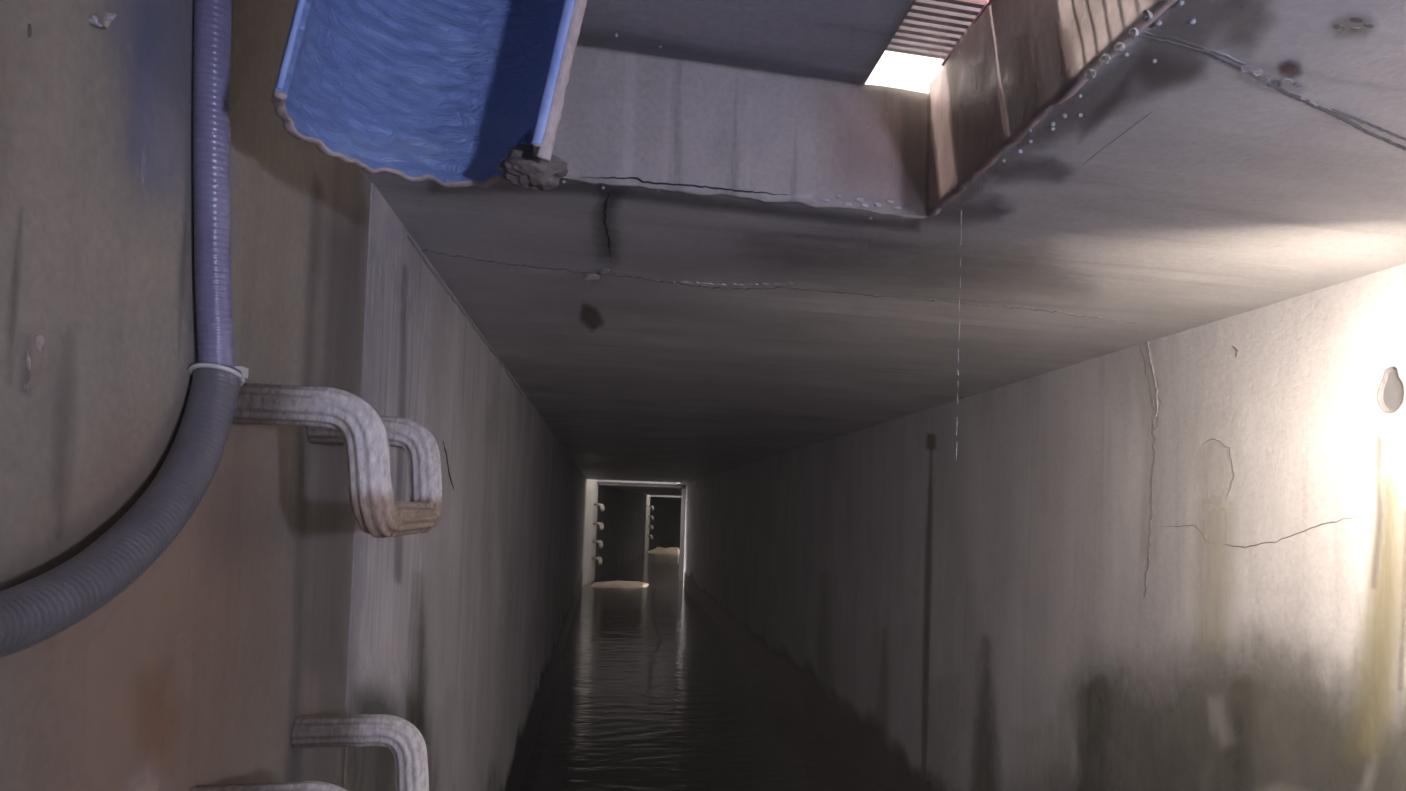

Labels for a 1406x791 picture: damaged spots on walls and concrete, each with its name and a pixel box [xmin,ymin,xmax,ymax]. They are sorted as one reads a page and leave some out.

crack [583,176,788,196]
damp [937,65,1004,204]
damp [1018,0,1263,138]
crack [1127,31,1406,151]
crack [422,249,1374,595]
damp [684,435,947,791]
damp [1074,423,1406,791]
damp [974,673,996,791]